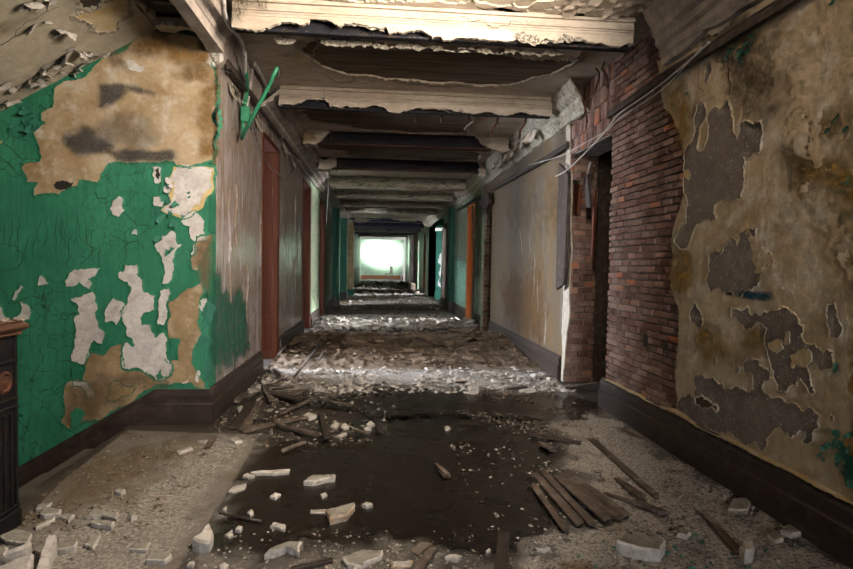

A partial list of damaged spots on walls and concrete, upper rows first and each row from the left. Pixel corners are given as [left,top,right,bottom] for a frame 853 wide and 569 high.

peeling [331,0,653,20]
flaking render [274,36,297,45]
flaking render [320,31,584,57]
leakage [100,84,143,107]
leakage [64,127,174,162]
peeling [491,130,536,172]
peeling [0,0,263,431]
crack [0,164,160,323]
flaking render [561,31,853,505]